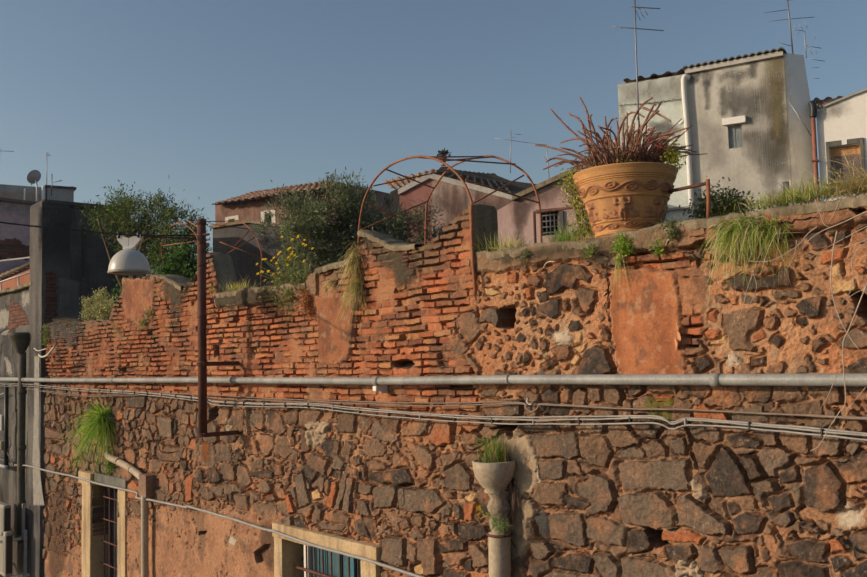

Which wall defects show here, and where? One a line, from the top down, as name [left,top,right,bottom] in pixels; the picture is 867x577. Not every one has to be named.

water stain [689,70,710,108]
water stain [722,56,789,175]
spalling [0,238,30,260]
spalling [0,292,29,336]